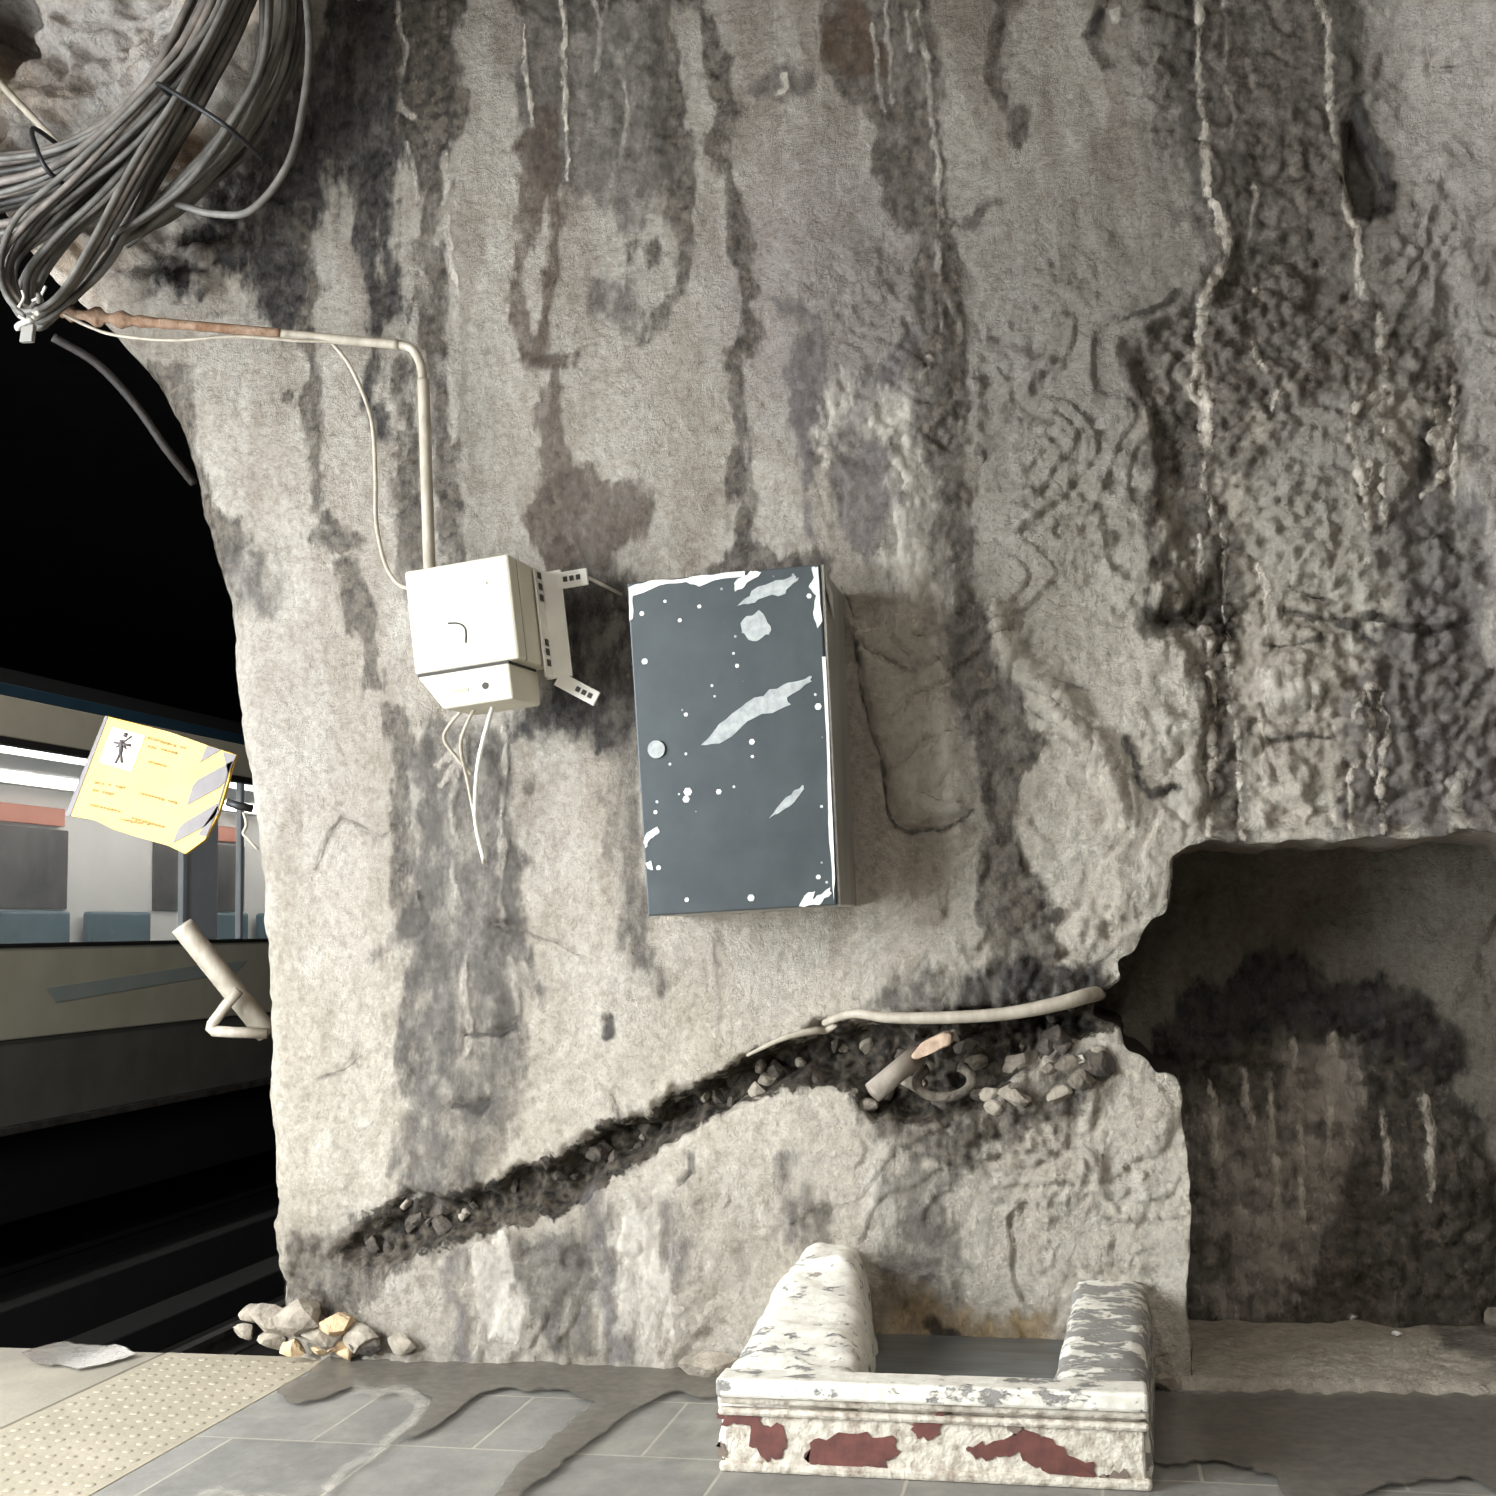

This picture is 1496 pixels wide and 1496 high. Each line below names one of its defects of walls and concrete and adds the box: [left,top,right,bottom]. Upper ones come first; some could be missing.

damp [147,0,833,1205]
damp [776,0,1105,1040]
damp [1129,0,1496,843]
crack [451,1099,490,1115]
crack [464,1022,518,1037]
crack [679,1151,693,1186]
damp [1152,951,1496,1360]
damp [278,1189,718,1496]
damp [1153,1389,1496,1496]